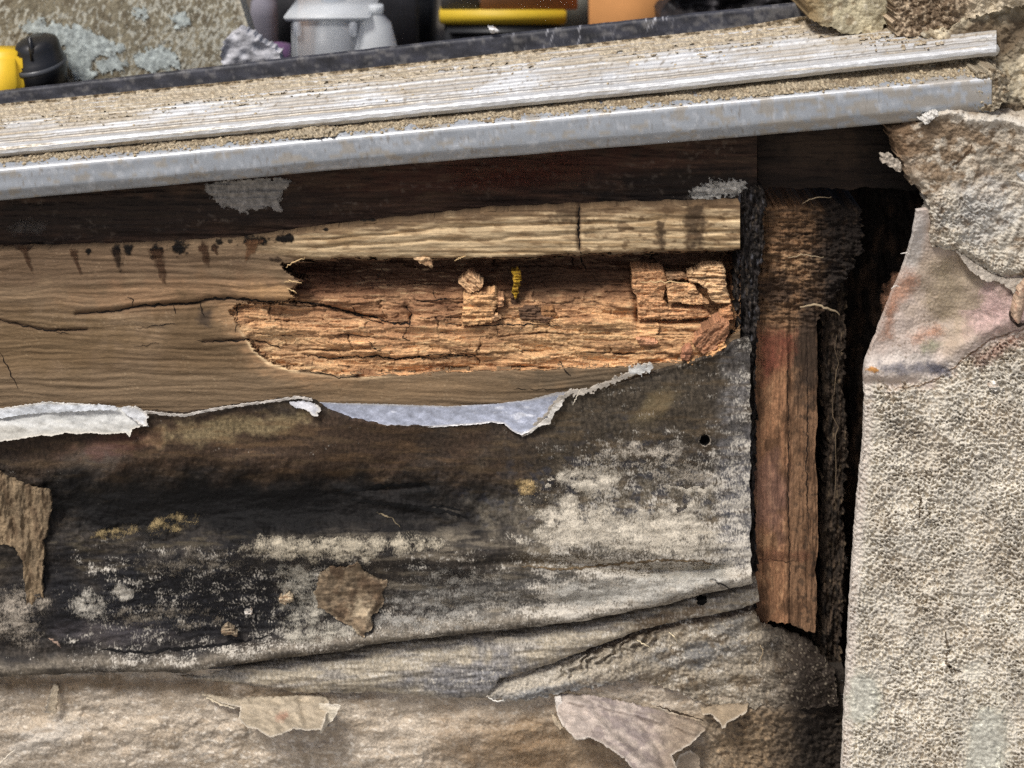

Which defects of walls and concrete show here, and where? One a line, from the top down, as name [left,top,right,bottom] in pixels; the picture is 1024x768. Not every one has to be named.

water stain [150,233,294,282]
crack [0,291,558,379]
peeling [146,396,321,417]
peeling [520,362,654,437]
peeling [0,471,53,605]
water stain [150,514,183,532]
water stain [515,441,732,608]
water stain [0,589,51,647]
water stain [71,583,203,629]
water stain [255,535,444,646]
peeling [313,562,388,637]
water stain [374,570,521,631]